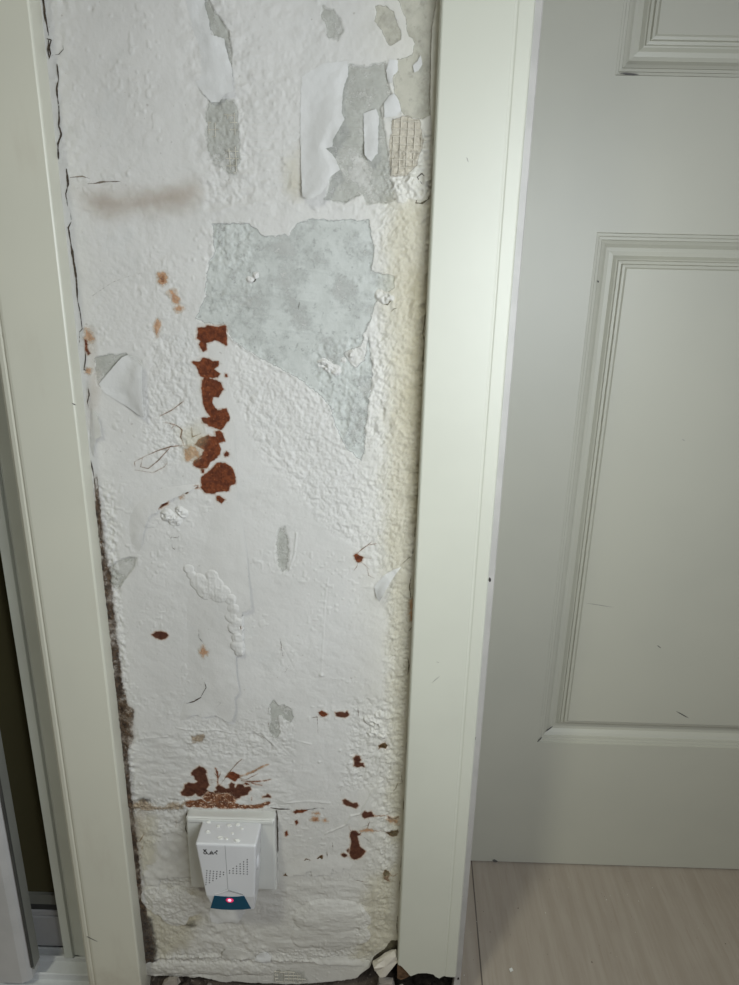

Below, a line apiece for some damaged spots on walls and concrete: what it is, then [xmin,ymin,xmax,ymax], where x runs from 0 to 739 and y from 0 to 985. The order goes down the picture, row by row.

peeling [186,0,233,102]
peeling [300,0,437,204]
crack [42,0,90,404]
peeling [95,354,144,418]
rust [180,325,236,504]
flaking render [180,218,395,722]
rust [151,631,168,640]
rust [181,759,271,809]
rust [341,799,399,860]
spalling [150,940,397,985]